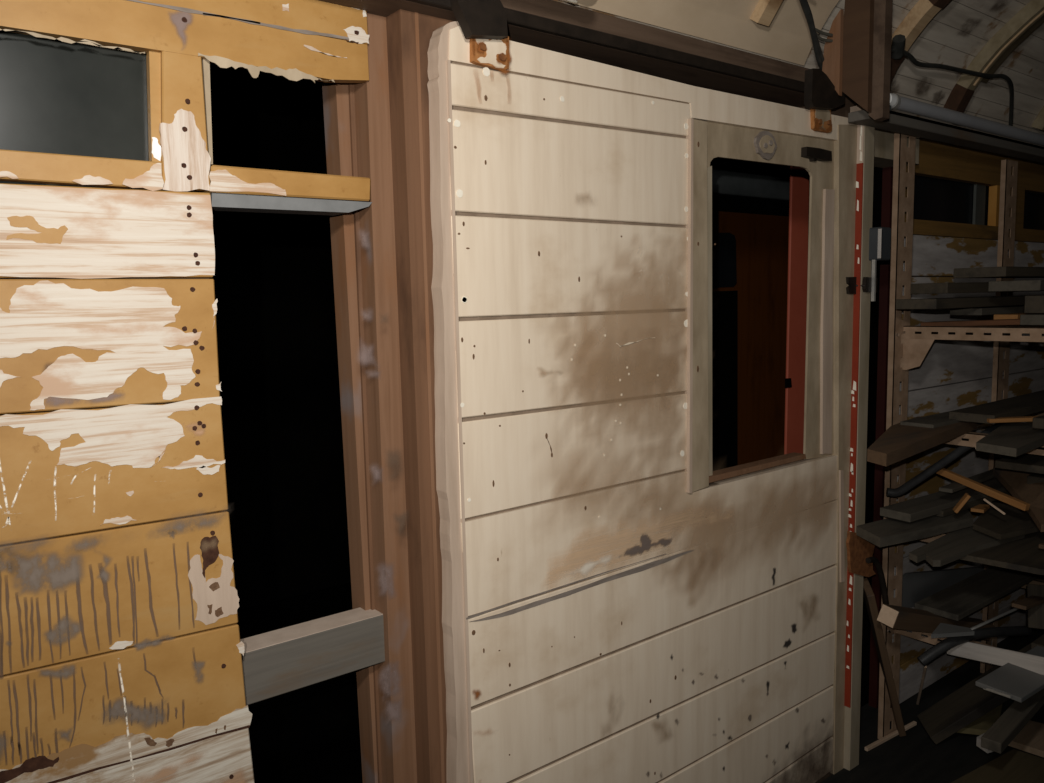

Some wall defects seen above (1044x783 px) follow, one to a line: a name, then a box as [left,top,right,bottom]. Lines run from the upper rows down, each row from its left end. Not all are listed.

peeling [0,29,145,54]
peeling [198,53,335,83]
peeling [343,7,369,44]
peeling [0,109,286,475]
peeling [188,536,239,625]
crack [466,550,694,622]